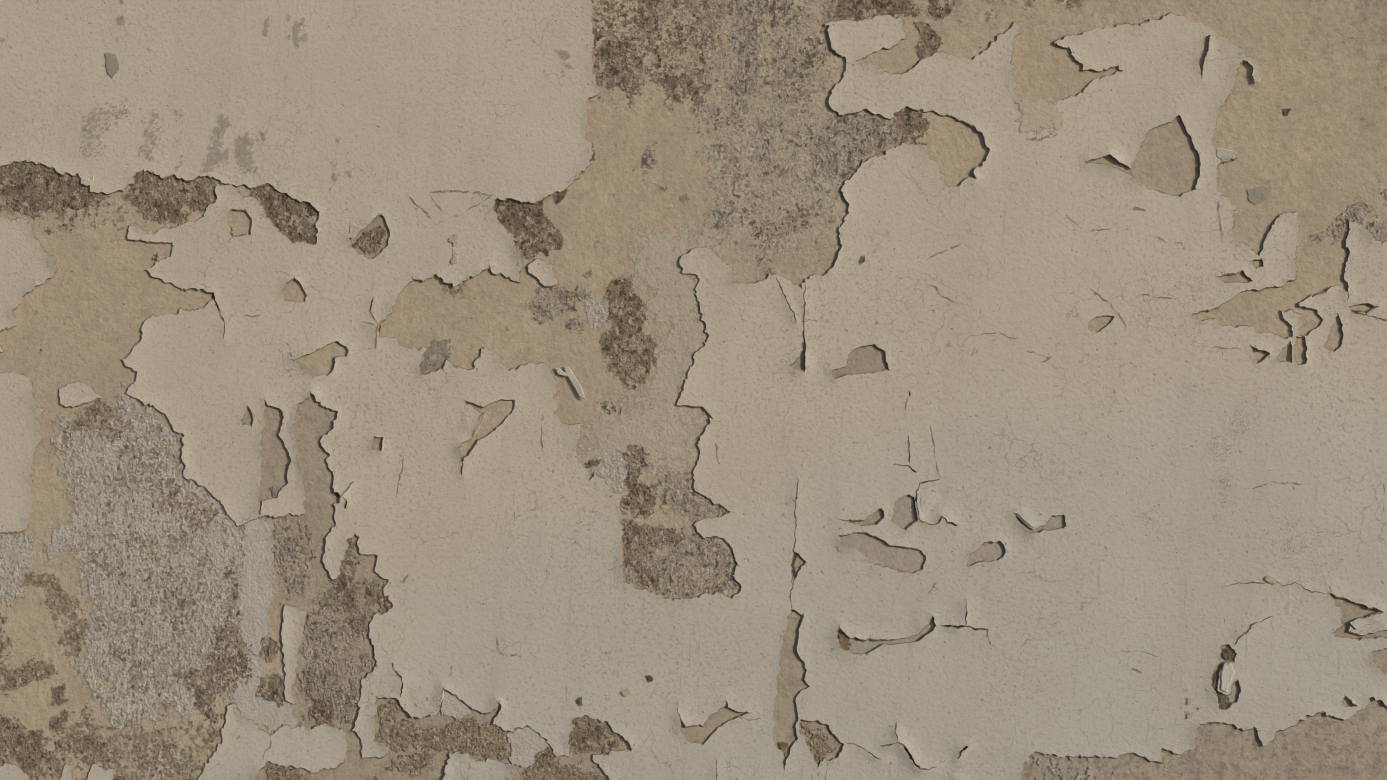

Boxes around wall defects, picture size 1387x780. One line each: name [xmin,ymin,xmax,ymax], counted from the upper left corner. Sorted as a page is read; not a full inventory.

peeling [380,0,1387,600]
peeling [0,160,631,780]
peeling [773,611,844,765]
peeling [1021,645,1387,780]
peeling [1330,594,1387,673]